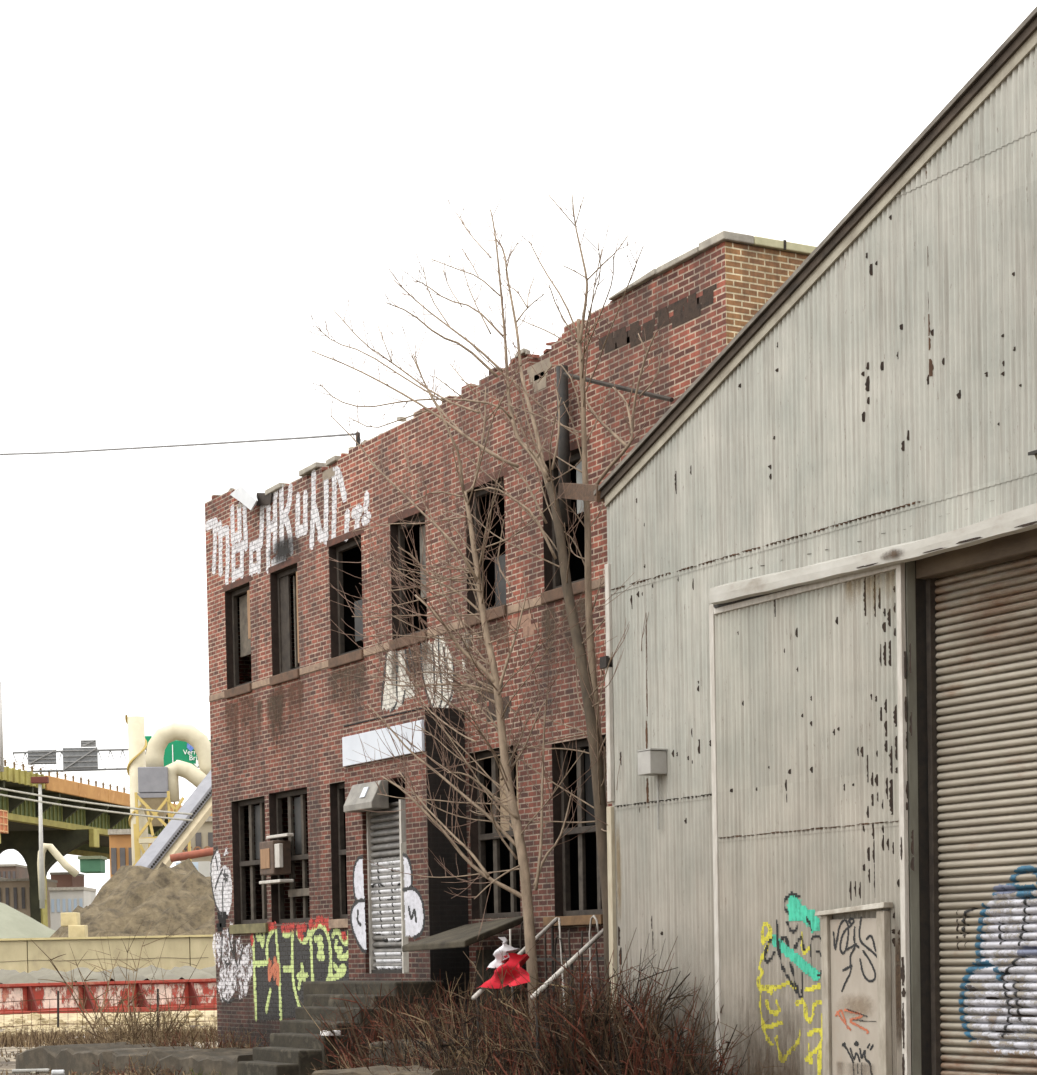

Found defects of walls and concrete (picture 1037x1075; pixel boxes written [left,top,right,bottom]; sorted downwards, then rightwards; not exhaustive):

peeling [861,362,884,422]
peeling [857,563,896,666]
peeling [857,694,912,832]
peeling [849,826,914,901]
peeling [891,913,906,1075]